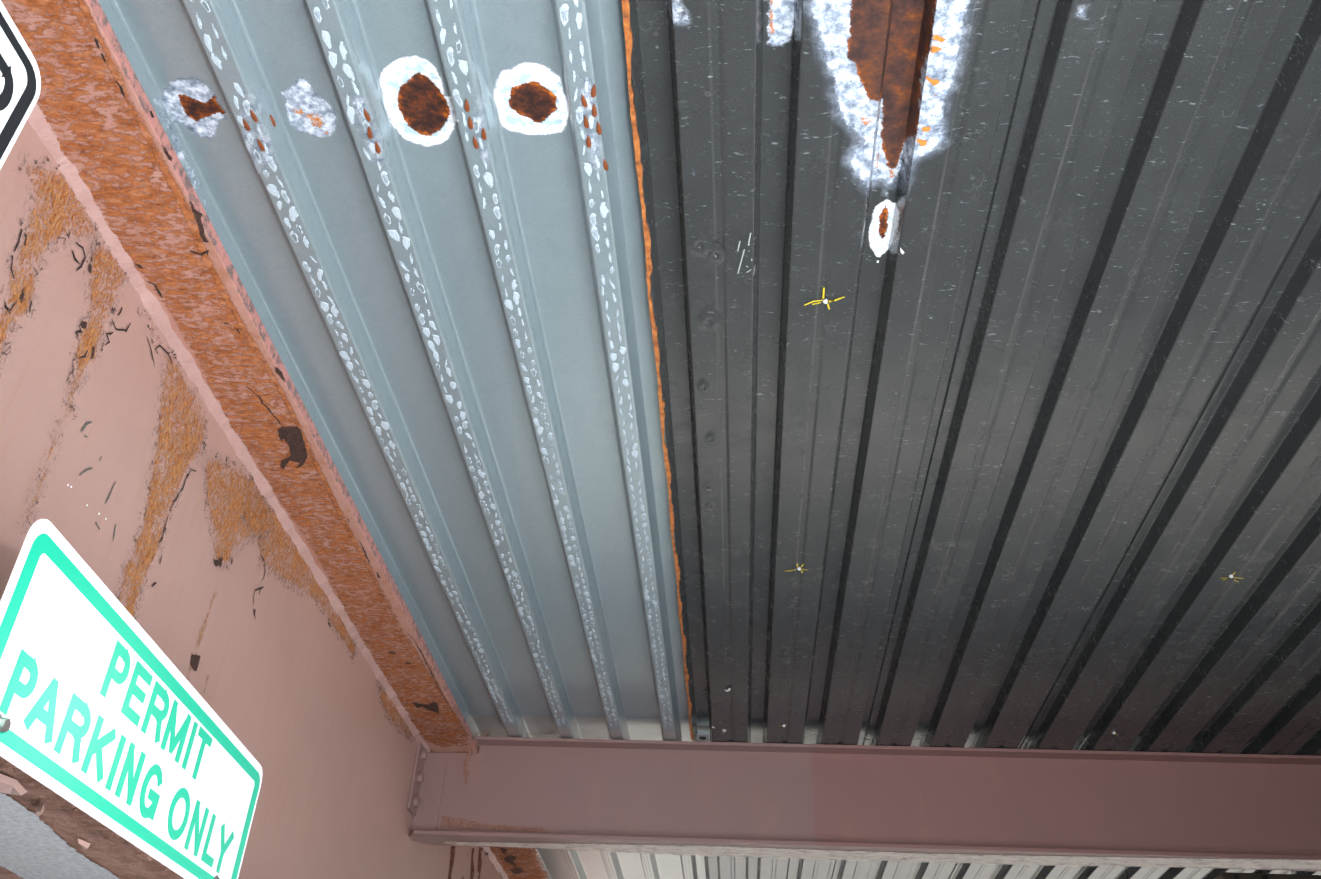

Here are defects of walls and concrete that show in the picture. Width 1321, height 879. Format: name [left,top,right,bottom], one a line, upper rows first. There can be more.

spalling [189,201,209,243]
rust [669,0,688,24]
rust [766,0,970,257]
rust [0,0,565,780]
peeling [278,427,308,469]
rust [379,0,617,726]
rust [494,0,672,728]
rust [448,846,549,879]